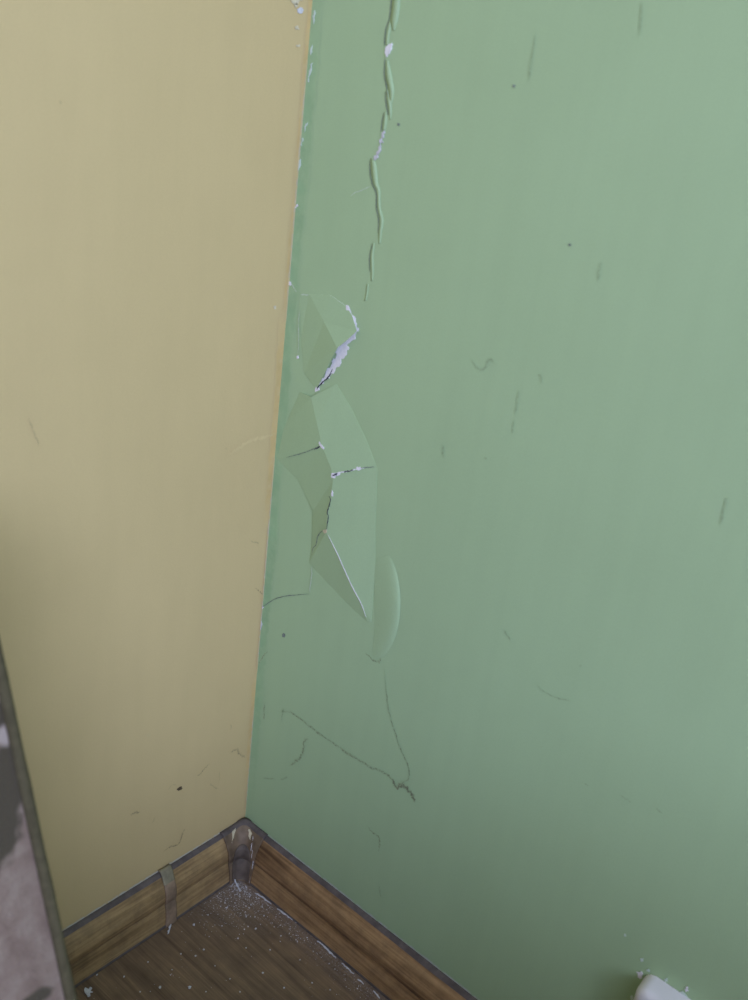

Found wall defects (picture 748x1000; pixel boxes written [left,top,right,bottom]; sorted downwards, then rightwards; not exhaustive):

spalling [315,305,359,392]
crack [331,467,371,478]